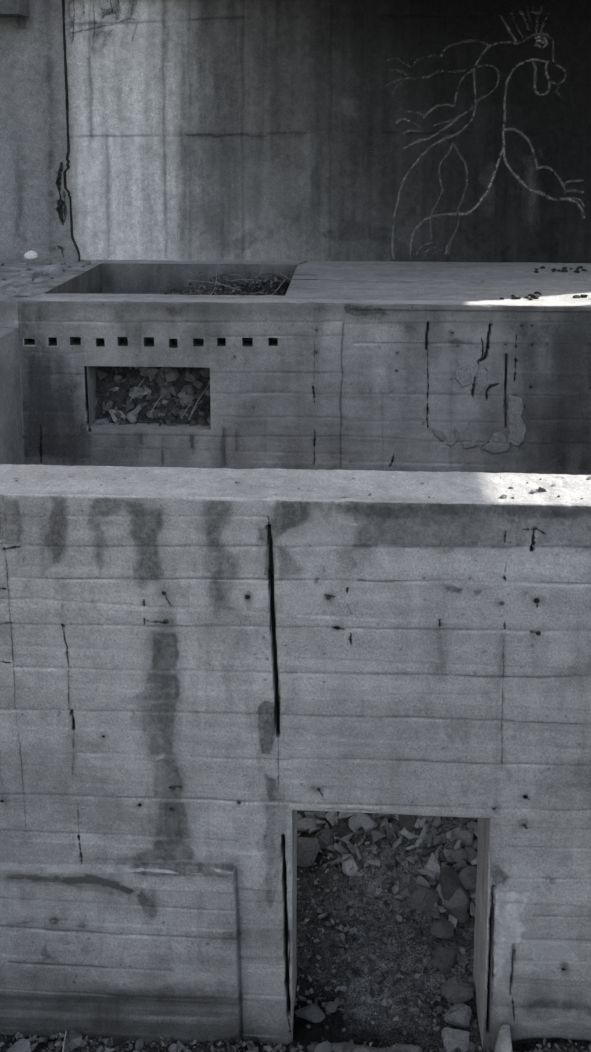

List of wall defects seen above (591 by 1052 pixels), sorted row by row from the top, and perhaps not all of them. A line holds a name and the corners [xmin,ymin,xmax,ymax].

crack [423,322,431,428]
crack [471,325,525,437]
peeling [431,395,526,454]
leakage [48,502,67,559]
leakage [92,500,162,578]
crack [268,518,280,732]
leakage [7,874,153,916]
leakage [133,841,233,877]
crack [282,834,291,1033]